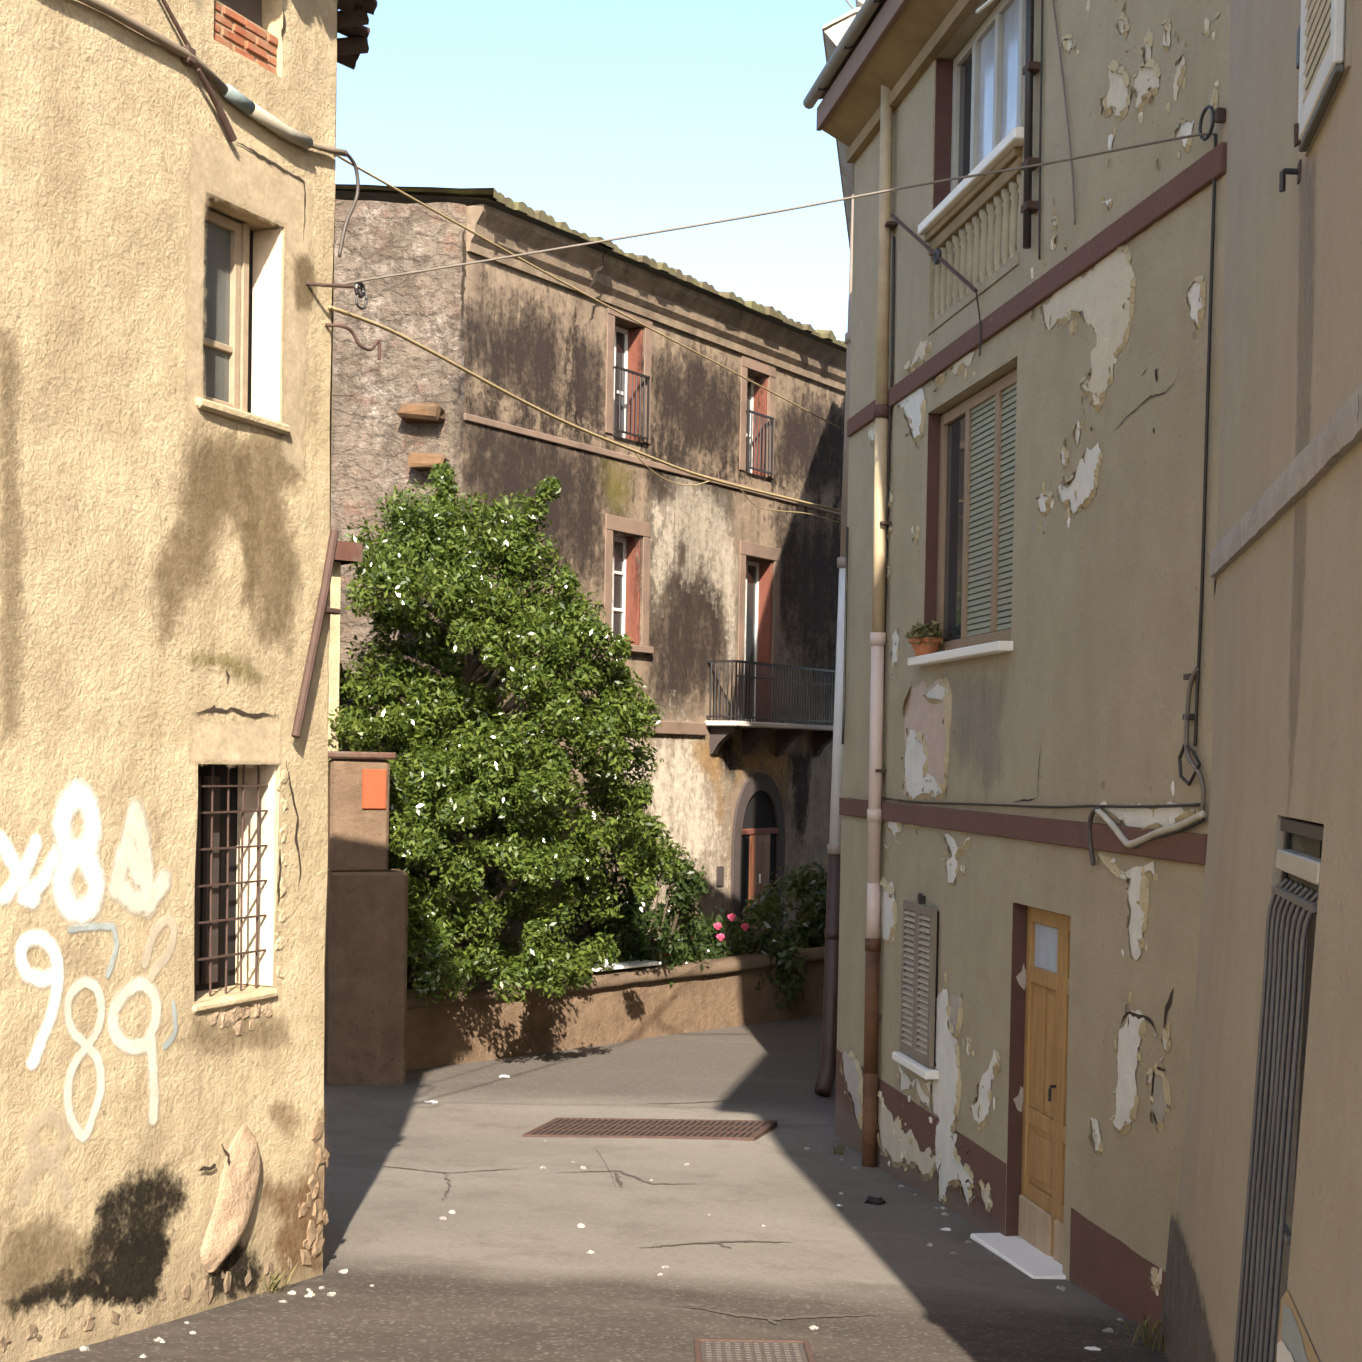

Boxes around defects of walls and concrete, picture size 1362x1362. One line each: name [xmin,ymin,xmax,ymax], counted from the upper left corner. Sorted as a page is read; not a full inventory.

peeling [1100,0,1194,169]
leakage [158,437,298,635]
crack [195,670,279,718]
leakage [457,289,622,585]
leakage [623,342,755,925]
leakage [764,385,845,701]
flaking render [897,672,954,806]
peeling [1031,244,1136,533]
peeling [1097,851,1158,961]
peeling [840,972,1000,1212]
peeling [1088,992,1175,1156]
leakage [6,1167,186,1315]